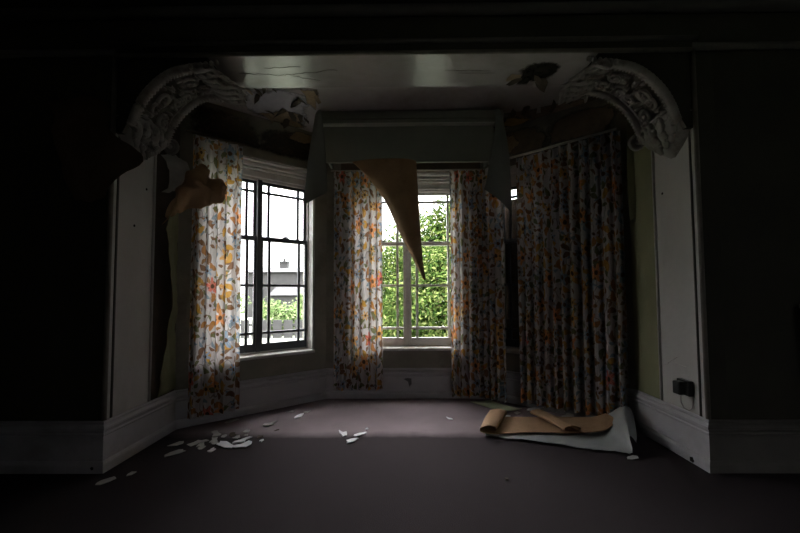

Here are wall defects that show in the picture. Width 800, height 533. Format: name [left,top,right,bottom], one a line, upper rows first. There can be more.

flaking render [506,62,560,92]
peeling [245,88,321,129]